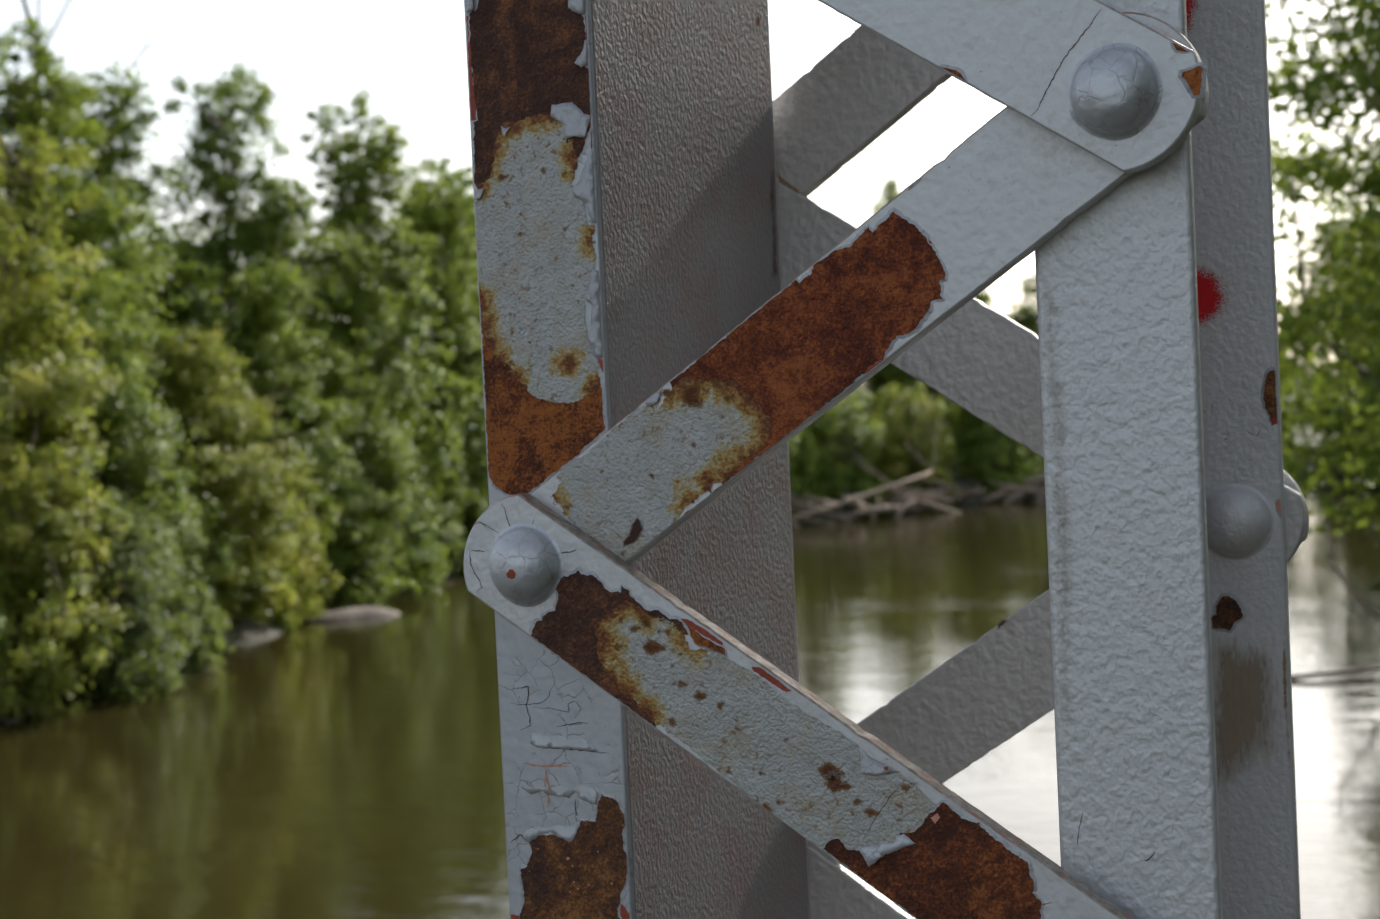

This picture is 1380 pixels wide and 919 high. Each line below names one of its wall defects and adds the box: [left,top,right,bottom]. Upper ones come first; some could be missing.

corrosion [465,0,592,187]
corrosion [478,270,606,496]
corrosion [670,207,949,516]
corrosion [529,566,691,727]
crack [511,683,610,814]
corrosion [511,790,630,919]
corrosion [821,800,1045,919]